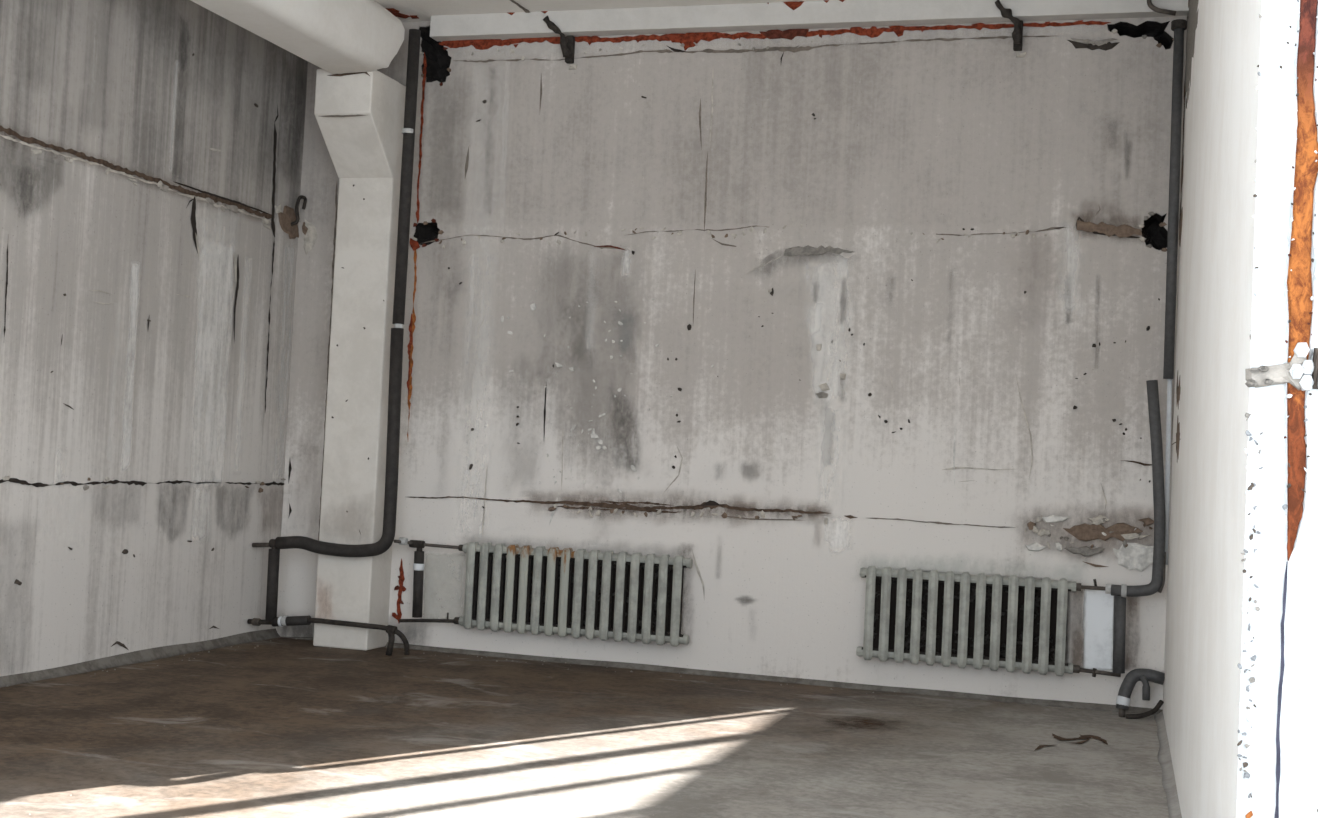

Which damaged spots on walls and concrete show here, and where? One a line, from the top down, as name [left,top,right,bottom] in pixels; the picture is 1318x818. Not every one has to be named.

corrosion [439,20,1111,50]
corrosion [416,52,427,223]
spalling [1076,0,1199,246]
crack [0,104,278,411]
crack [0,184,338,541]
corrosion [407,238,420,437]
corrosion [392,558,406,623]
crack [410,496,1015,528]
spalling [1024,514,1154,571]